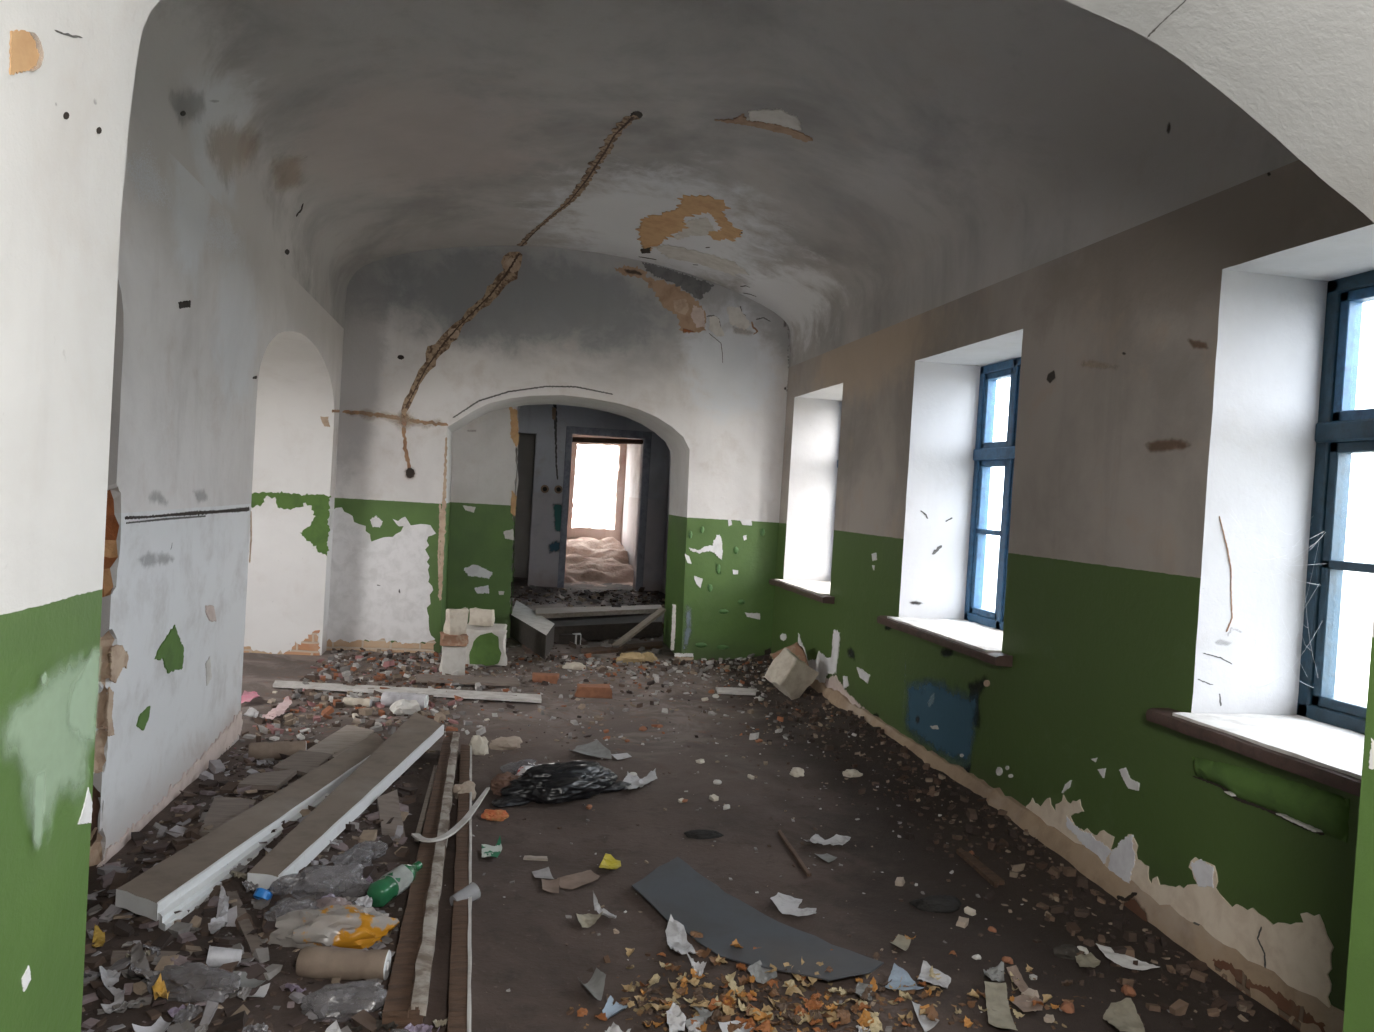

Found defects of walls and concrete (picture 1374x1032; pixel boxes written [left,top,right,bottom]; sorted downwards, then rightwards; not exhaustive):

crack [1147,0,1186,38]
peeling [714,108,813,142]
crack [332,115,640,480]
peeling [615,195,786,363]
flaking render [102,490,119,597]
peeling [244,437,476,656]
peeling [464,565,504,595]
peeling [685,519,752,588]
flaking render [78,631,243,867]
peeling [1026,780,1334,1032]